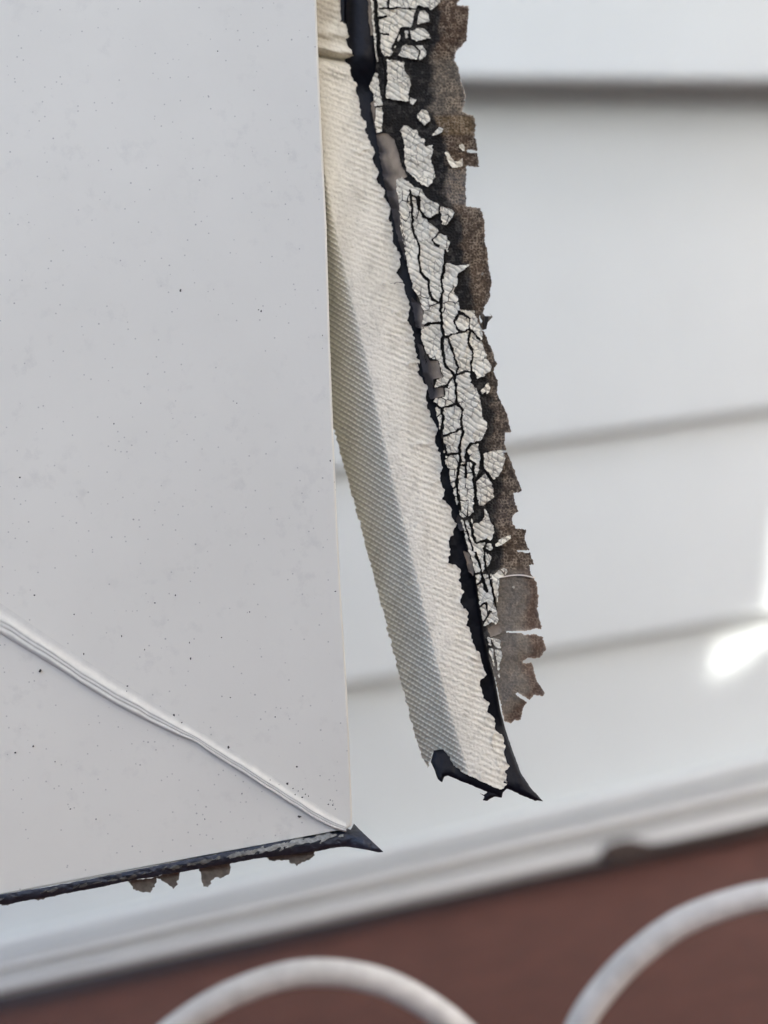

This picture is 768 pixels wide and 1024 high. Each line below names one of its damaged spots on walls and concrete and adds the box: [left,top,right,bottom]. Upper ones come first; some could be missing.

peeling [369,0,511,677]